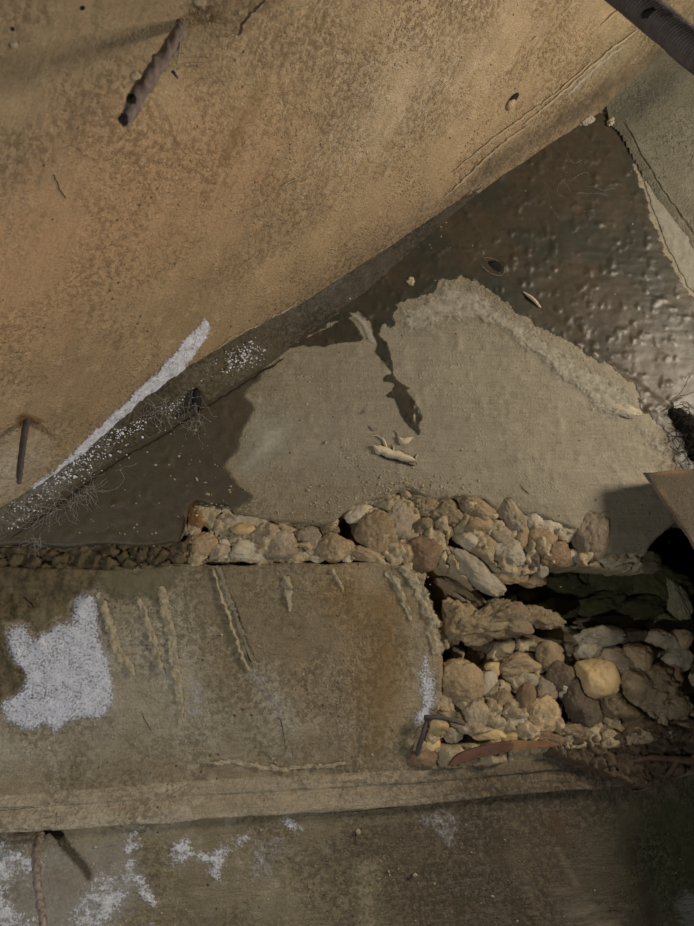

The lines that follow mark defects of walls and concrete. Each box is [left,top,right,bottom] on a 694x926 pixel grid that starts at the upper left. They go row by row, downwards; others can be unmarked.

leakage [32,318,210,489]
peeling [368,425,418,466]
leakage [0,366,265,734]
leakage [0,828,157,926]